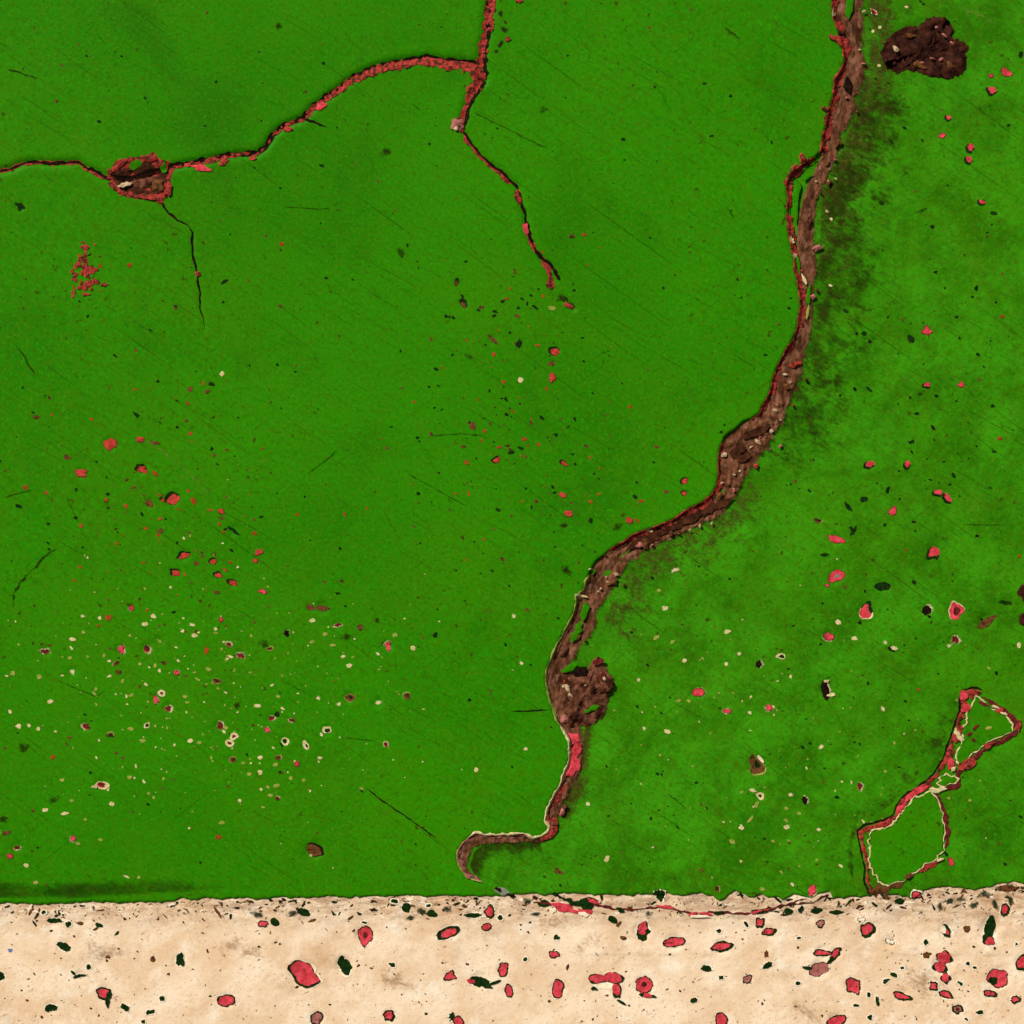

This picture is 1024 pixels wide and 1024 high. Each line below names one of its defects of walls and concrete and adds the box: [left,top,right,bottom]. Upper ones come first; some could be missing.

flaking render [880,16,969,80]
crack [0,160,112,180]
crack [155,0,574,310]
crack [161,203,205,329]
crack [456,0,874,883]